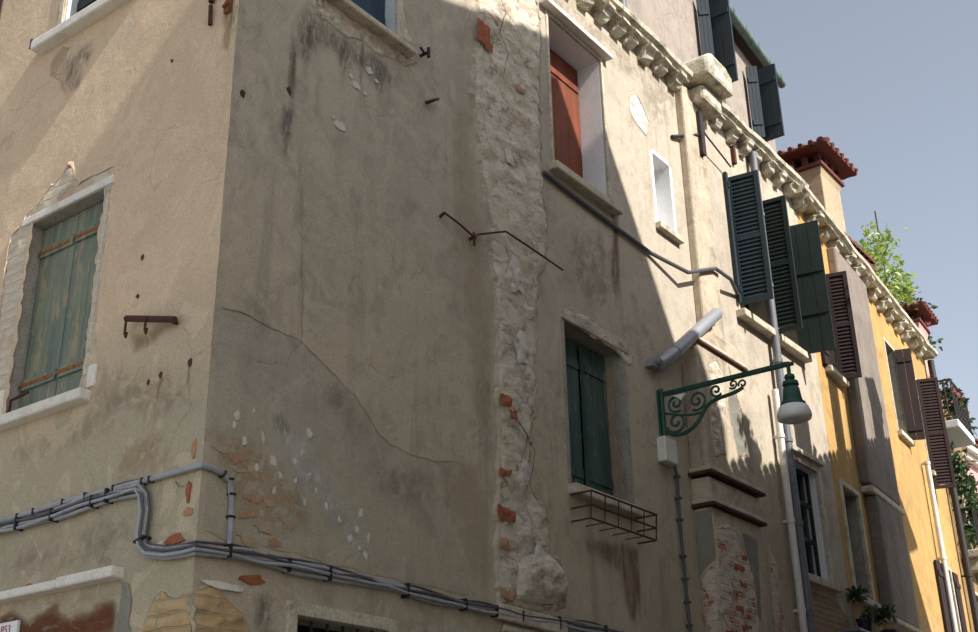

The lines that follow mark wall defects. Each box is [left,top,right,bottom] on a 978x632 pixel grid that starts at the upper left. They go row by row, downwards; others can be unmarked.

spalling [0,161,118,414]
crack [222,151,458,520]
spalling [467,0,567,613]
spalling [136,575,266,632]
flaking render [210,409,311,547]
spalling [701,524,759,632]